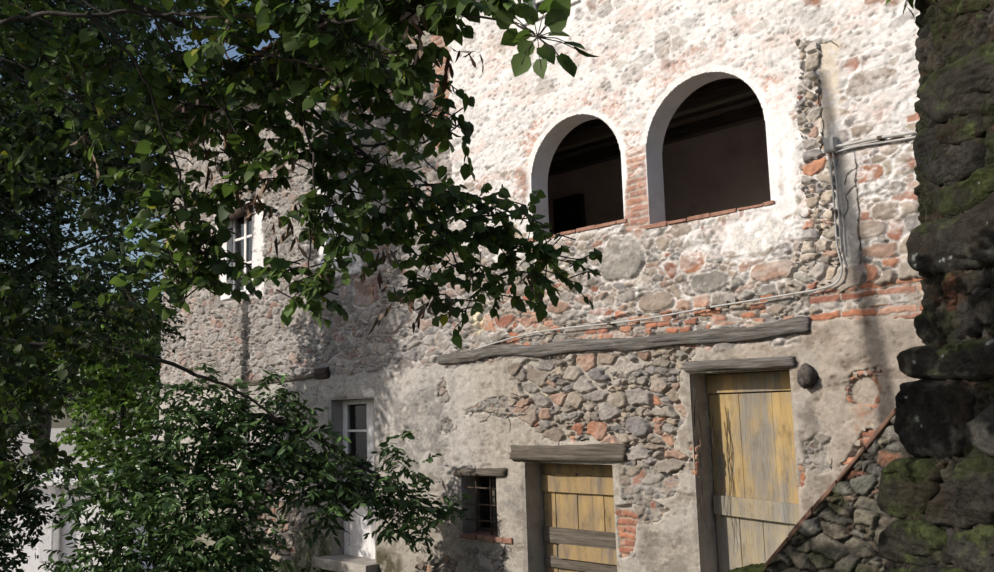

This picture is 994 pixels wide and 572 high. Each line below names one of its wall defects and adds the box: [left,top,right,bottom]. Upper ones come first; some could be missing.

spalling [506,39,925,345]
peeling [470,309,486,335]
spalling [846,366,886,411]
spalling [441,419,457,435]
spalling [466,345,701,558]
spalling [796,424,879,490]
spalling [414,555,458,572]
spalling [486,550,508,572]